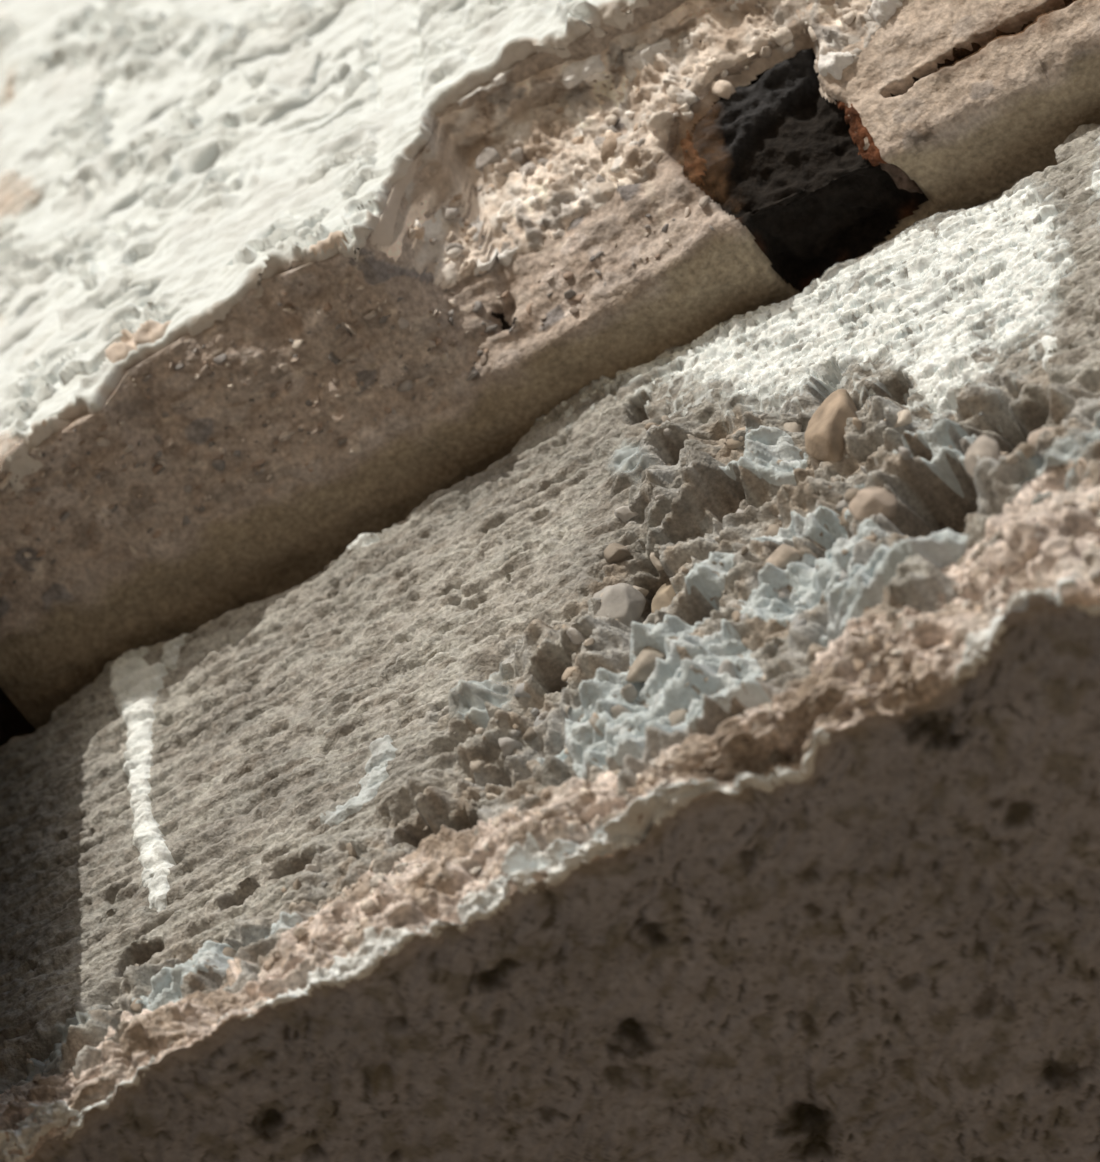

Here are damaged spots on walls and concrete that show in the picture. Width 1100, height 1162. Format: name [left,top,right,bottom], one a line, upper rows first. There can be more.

crack [890,0,1077,97]
flaking render [370,0,903,290]
corrosion [680,129,707,186]
corrosion [837,101,923,194]
crack [916,126,931,141]
damp [1085,169,1100,198]
peeling [309,231,348,256]
peeling [105,319,171,363]
peeling [491,312,517,331]
damp [121,634,189,670]
flaking render [0,457,1100,1162]
damp [141,868,170,912]